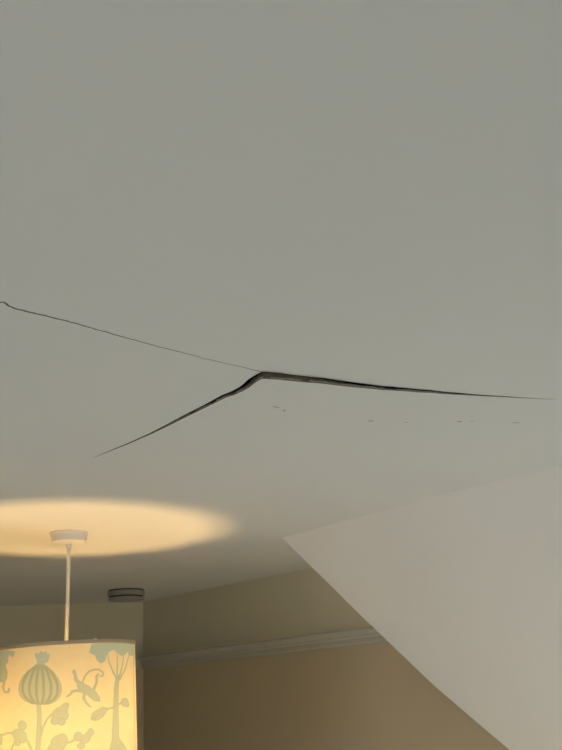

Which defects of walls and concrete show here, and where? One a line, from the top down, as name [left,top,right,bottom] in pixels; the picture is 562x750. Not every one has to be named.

crack [0,302,537,458]